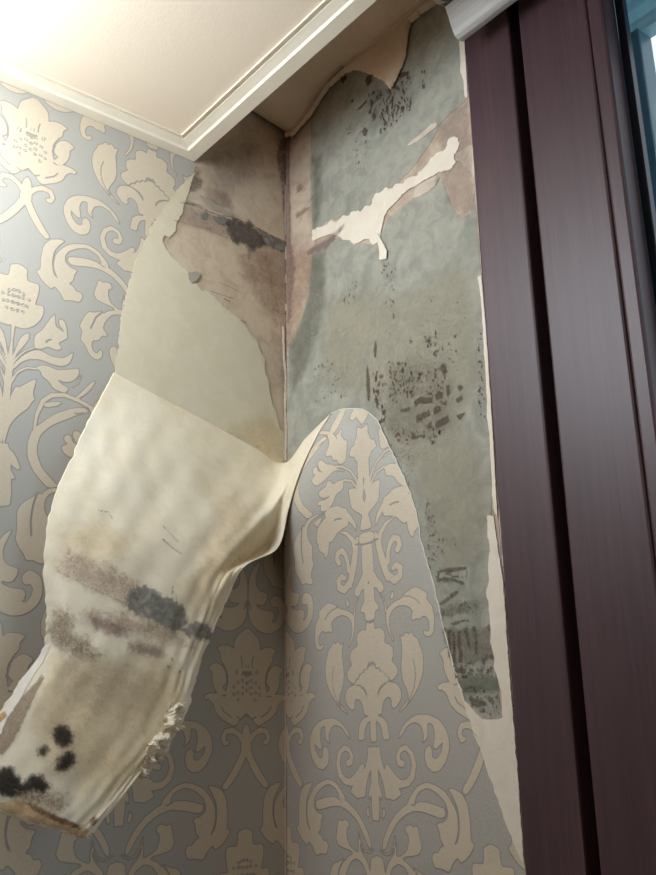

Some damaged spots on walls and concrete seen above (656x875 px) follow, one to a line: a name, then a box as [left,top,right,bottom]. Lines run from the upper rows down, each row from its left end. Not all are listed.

water stain [346,71,411,164]
water stain [187,137,301,319]
flaking render [163,0,514,721]
water stain [366,315,464,485]
water stain [49,611,100,657]
water stain [66,552,212,640]
water stain [425,499,500,716]
water stain [0,766,50,797]
water stain [39,724,75,771]